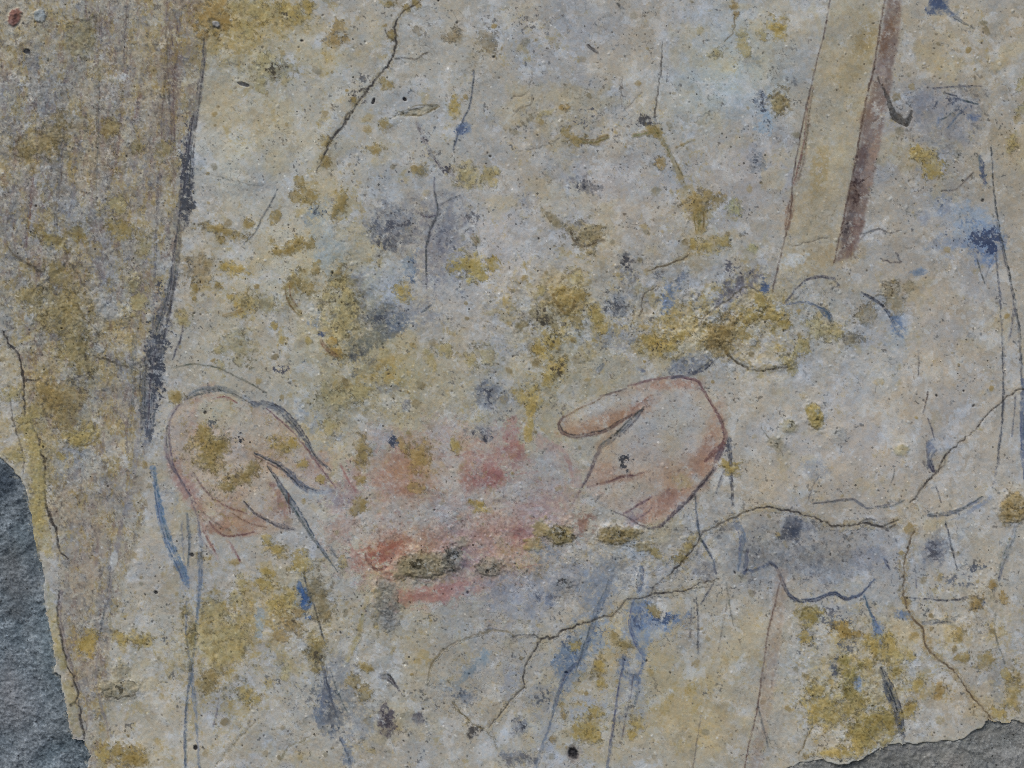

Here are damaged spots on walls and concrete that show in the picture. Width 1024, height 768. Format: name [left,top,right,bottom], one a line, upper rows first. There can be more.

crack [314,0,429,178]
crack [2,330,47,475]
spalling [0,458,91,768]
crack [47,507,70,560]
crack [56,589,86,741]
crack [426,387,1024,750]
spalling [789,719,1024,768]